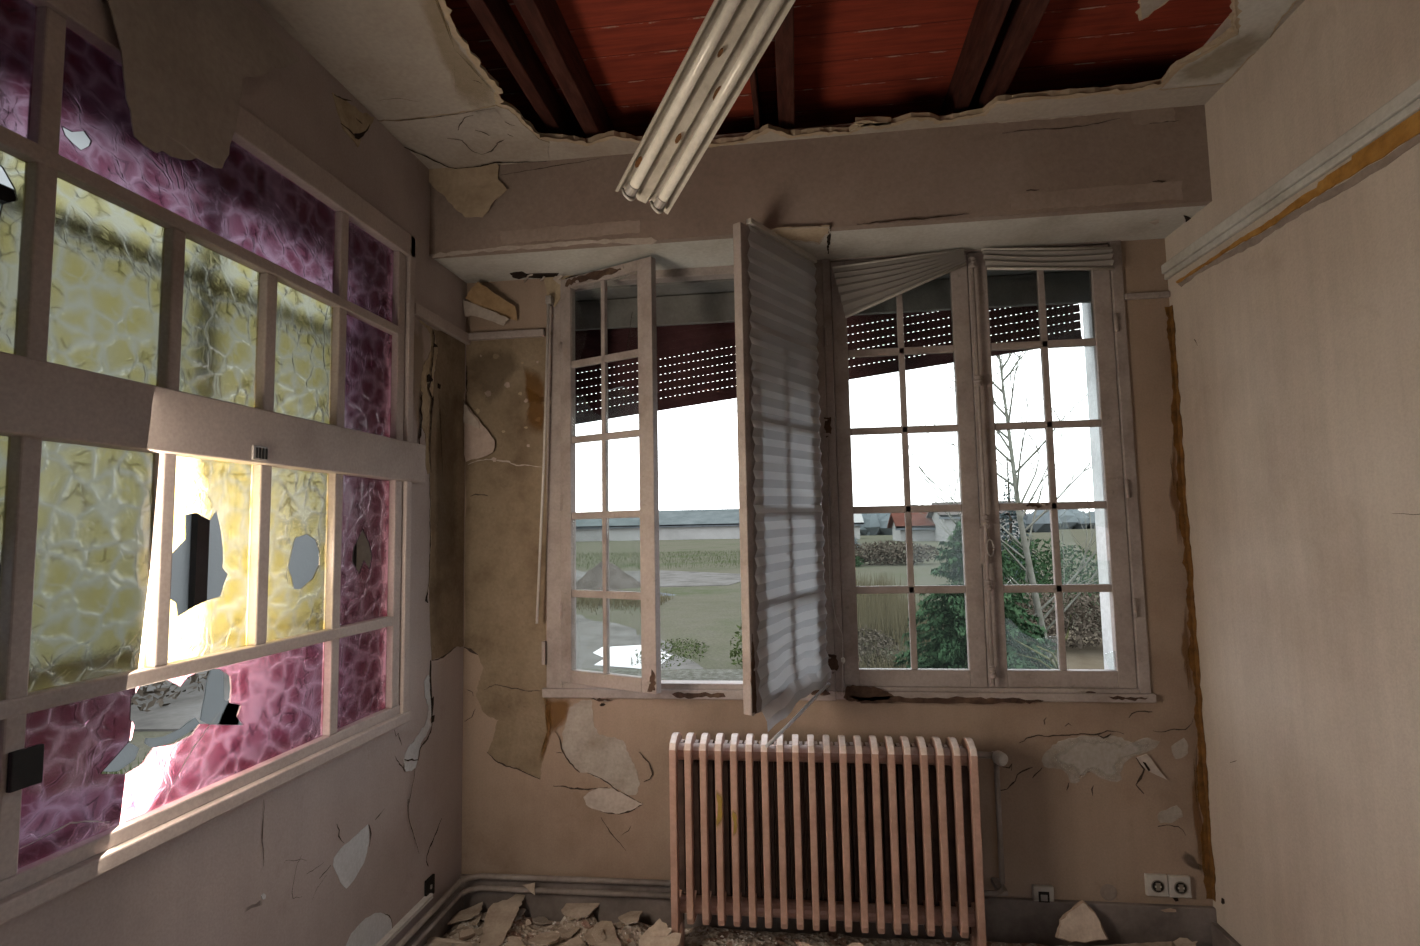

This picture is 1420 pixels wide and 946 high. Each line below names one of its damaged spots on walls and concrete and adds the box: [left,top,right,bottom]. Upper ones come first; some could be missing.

spalling [435,0,641,146]
flaking render [708,0,1298,148]
flaking render [394,282,653,814]
flaking render [1019,730,1188,794]
flaking render [319,812,382,889]
crack [408,769,442,866]
flaking render [346,913,393,946]